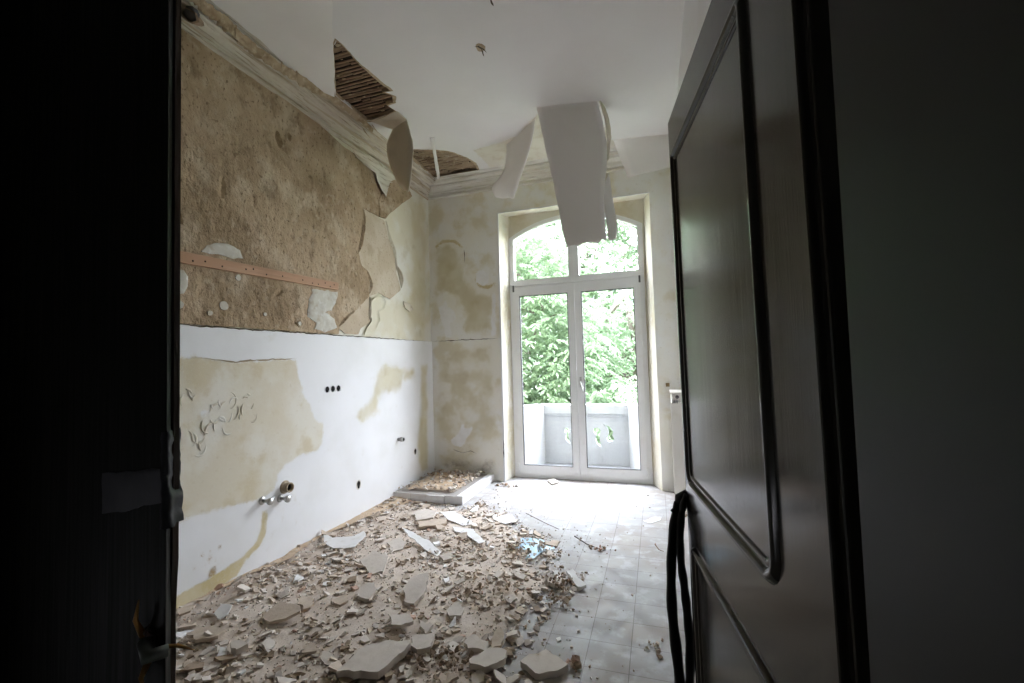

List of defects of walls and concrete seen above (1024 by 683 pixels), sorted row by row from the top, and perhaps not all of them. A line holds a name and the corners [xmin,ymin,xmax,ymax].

flaking render [180,28,412,335]
flaking render [473,114,547,168]
water stain [356,198,512,473]
water stain [176,356,324,609]